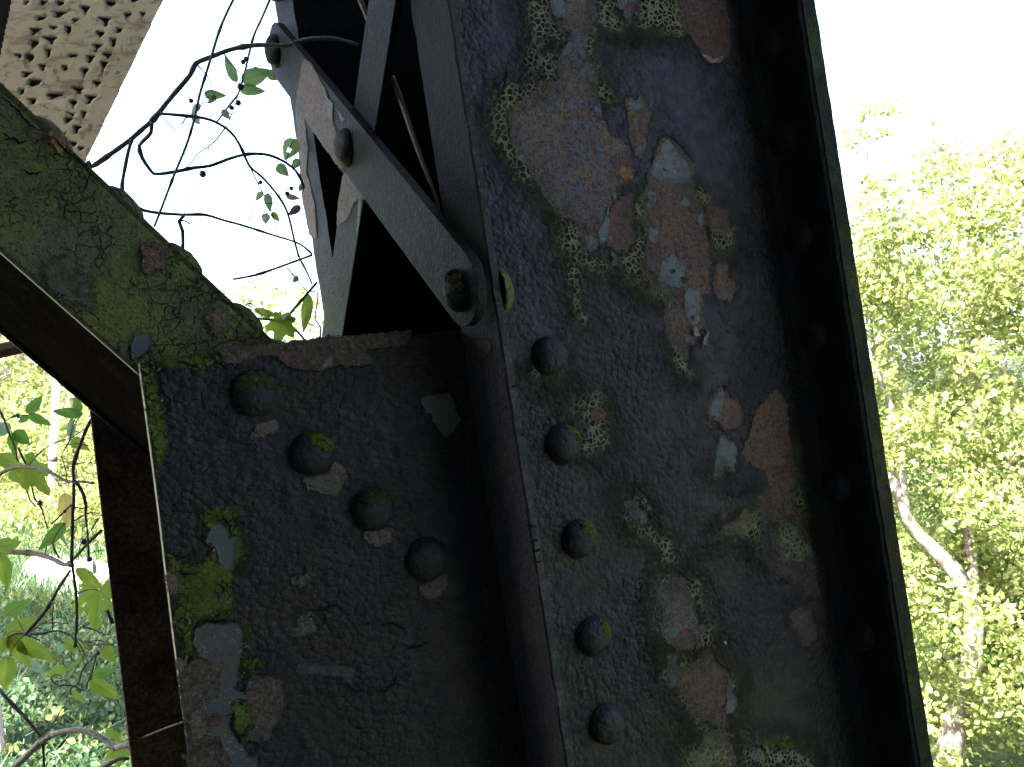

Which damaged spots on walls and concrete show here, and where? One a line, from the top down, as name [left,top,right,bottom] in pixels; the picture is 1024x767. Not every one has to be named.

corrosion [671,0,732,65]
crack [0,93,86,175]
peeling [295,59,363,239]
corrosion [704,199,740,303]
peeling [421,393,461,438]
peeling [162,571,179,596]
peeling [206,523,237,572]
corrosion [741,388,823,654]
peeling [174,622,258,767]